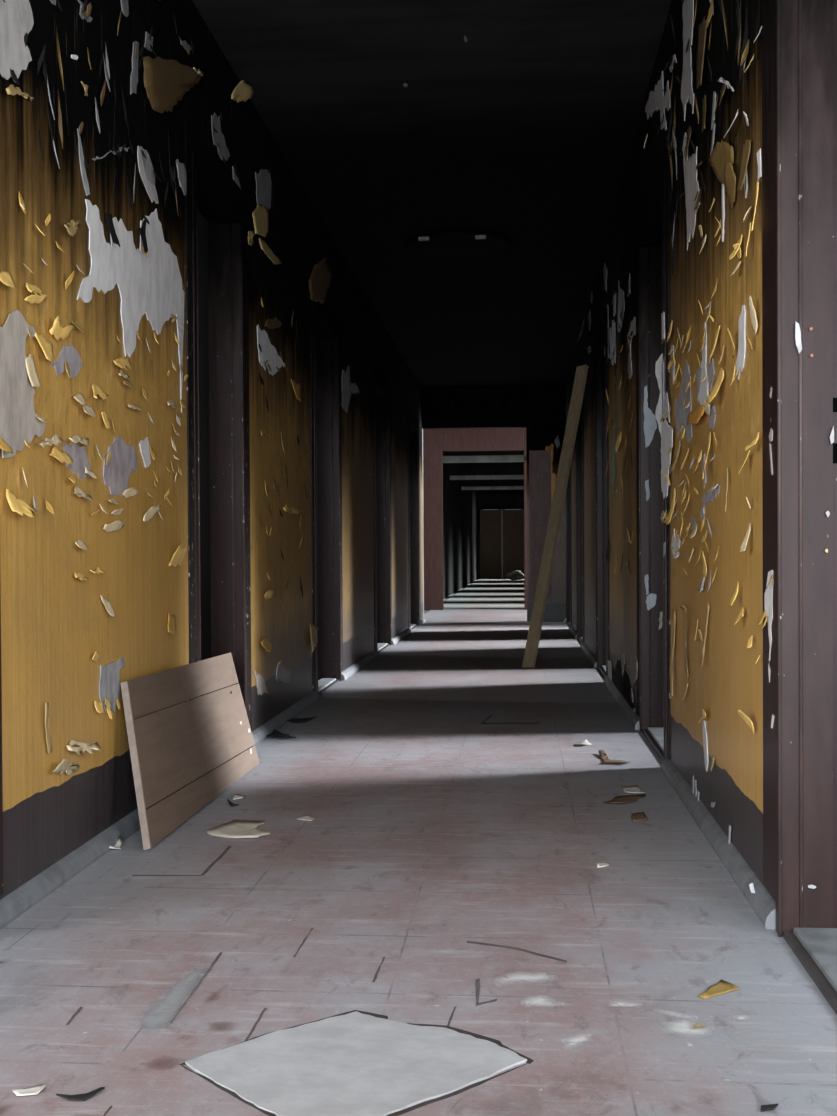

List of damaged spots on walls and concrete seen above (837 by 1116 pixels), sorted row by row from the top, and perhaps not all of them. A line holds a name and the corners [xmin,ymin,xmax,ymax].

peeling [231,80,254,103]
peeling [211,111,241,189]
peeling [248,167,281,265]
flaking render [0,0,203,532]
flaking render [578,0,773,593]
flaking render [257,297,311,416]
peeling [645,574,663,630]
peeling [729,579,744,625]
flaking render [746,570,773,683]
flaking render [92,651,125,720]
peeling [45,702,101,776]
flaking render [691,709,716,807]